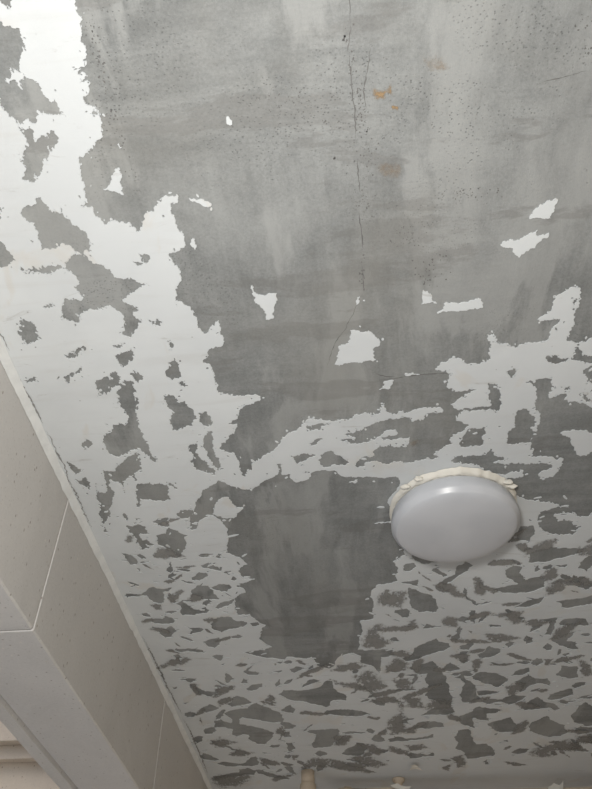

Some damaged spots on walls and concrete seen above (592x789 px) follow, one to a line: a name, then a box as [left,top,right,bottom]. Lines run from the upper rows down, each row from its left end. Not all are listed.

peeling [0,22,62,182]
crack [347,0,370,190]
peeling [0,241,15,268]
peeling [16,318,41,344]
peeling [21,197,145,367]
peeling [73,0,592,476]
crack [378,372,447,380]
peeling [67,358,592,786]